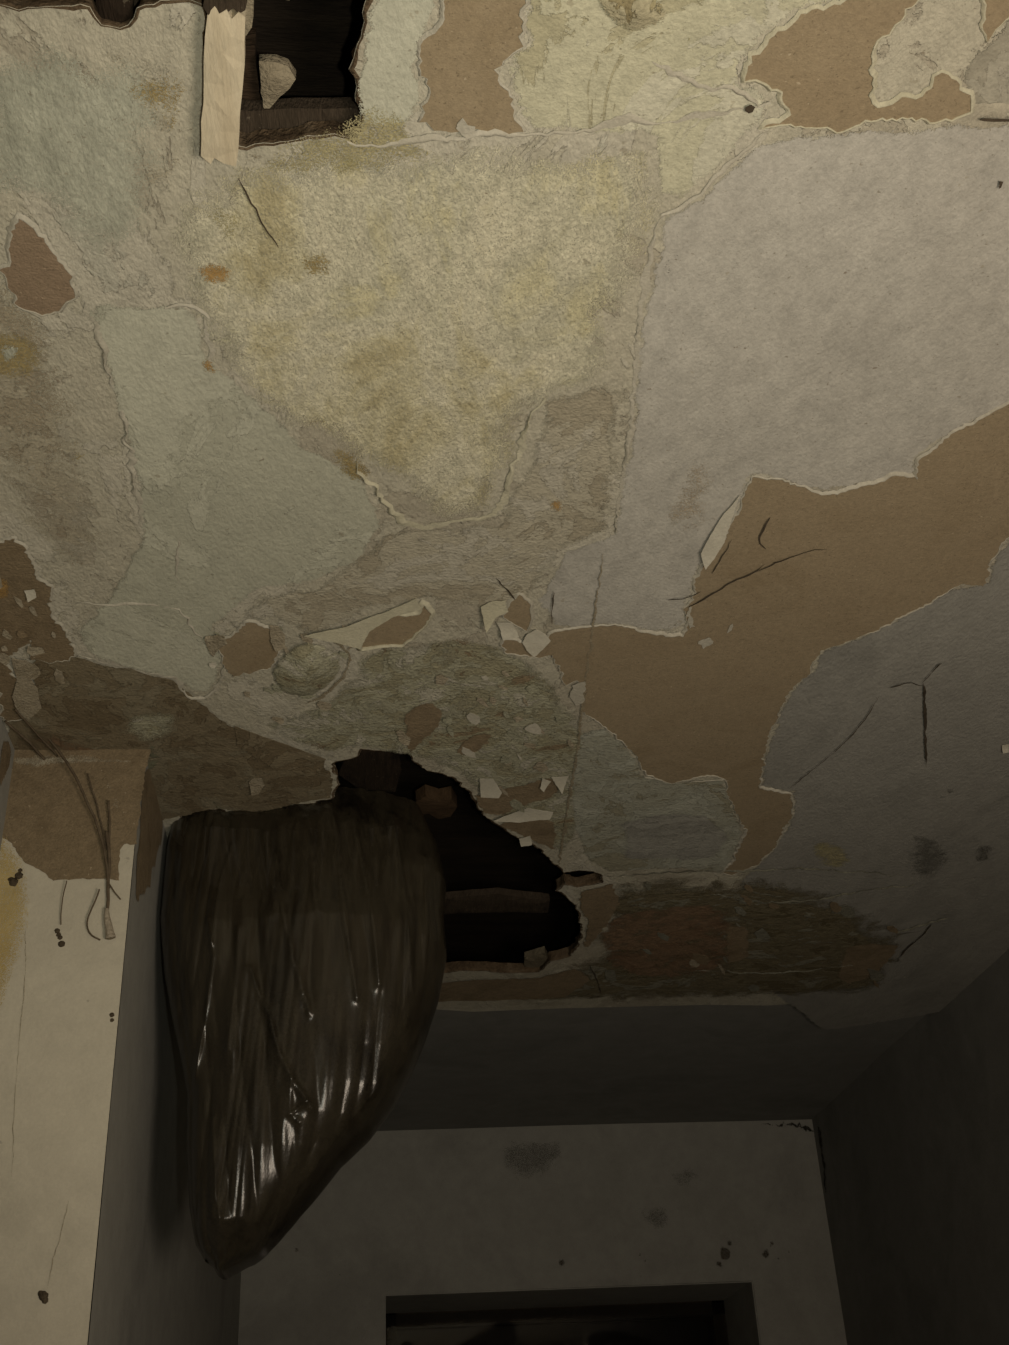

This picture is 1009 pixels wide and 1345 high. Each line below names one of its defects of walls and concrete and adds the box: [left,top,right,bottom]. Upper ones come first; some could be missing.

peeling [979,0,1009,43]
peeling [357,0,530,138]
peeling [740,0,976,134]
crack [980,116,1009,124]
peeling [0,212,79,317]
crack [671,517,814,607]
peeling [475,401,1009,875]
peeling [405,703,443,753]
peeling [438,969,589,1002]